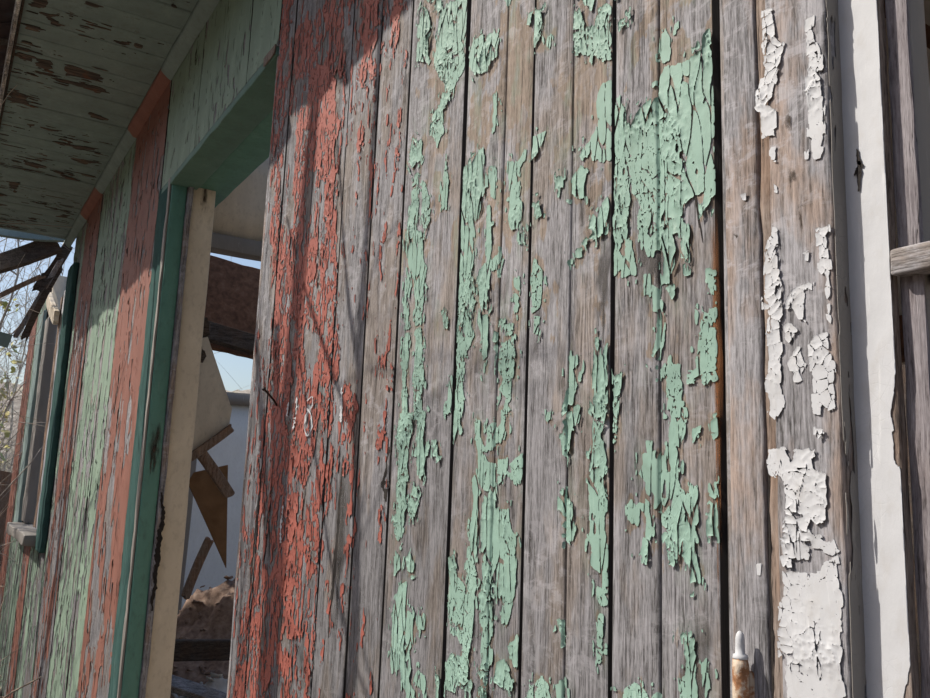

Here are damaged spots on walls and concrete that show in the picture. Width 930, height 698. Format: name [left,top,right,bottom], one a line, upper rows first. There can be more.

peeling [570,0,633,65]
peeling [754,8,785,162]
peeling [0,0,570,698]
peeling [554,16,720,597]
peeling [761,0,911,698]
crack [150,492,166,611]
peeling [542,328,626,674]
peeling [610,677,662,698]
peeling [672,626,718,698]